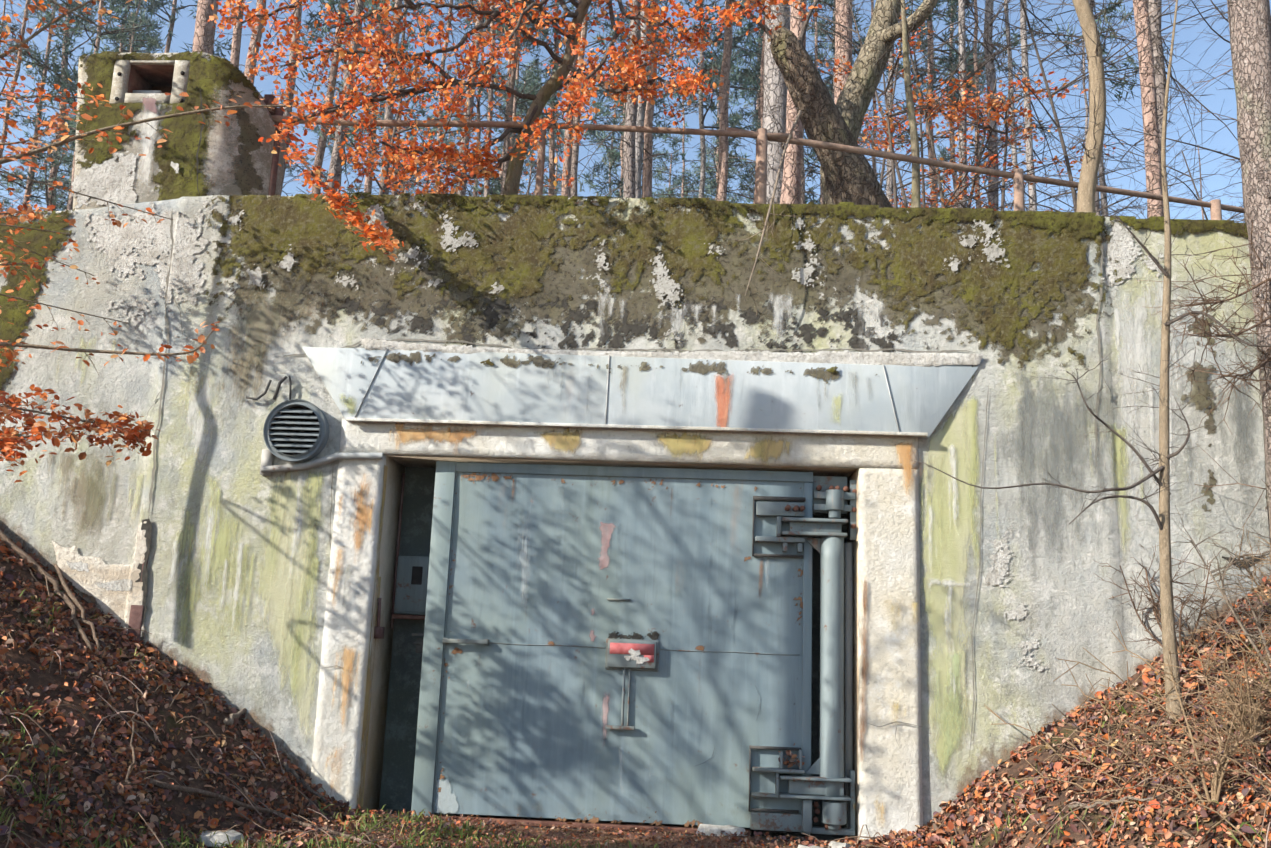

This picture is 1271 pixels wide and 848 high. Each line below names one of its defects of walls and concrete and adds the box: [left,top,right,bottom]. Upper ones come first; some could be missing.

spalling [386,210,479,296]
spalling [649,246,683,309]
spalling [791,217,838,300]
water stain [188,379,210,460]
rust [390,424,476,443]
rust [657,433,710,456]
rust [716,375,730,427]
water stain [1018,282,1163,544]
water stain [1169,314,1179,464]
peeling [52,521,147,637]
water stain [172,482,254,640]
rust [333,465,388,809]